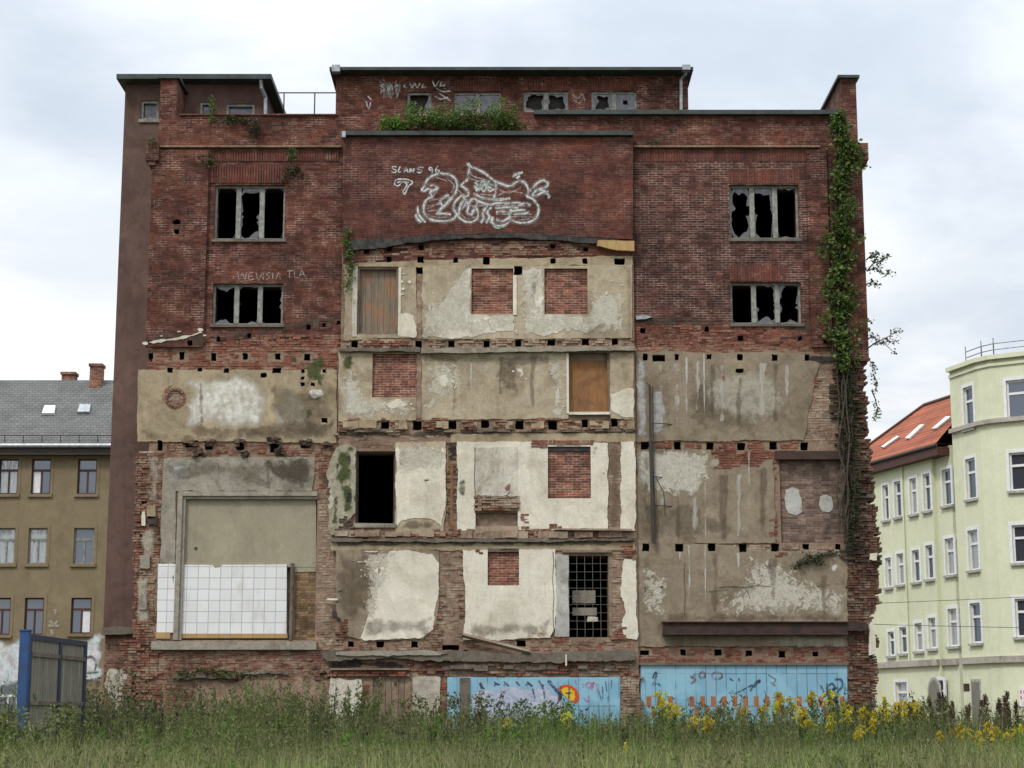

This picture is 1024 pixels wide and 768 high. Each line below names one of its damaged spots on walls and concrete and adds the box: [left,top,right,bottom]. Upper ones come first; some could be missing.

water stain [189,377,322,435]
water stain [674,354,789,421]
flaking render [104,241,848,737]